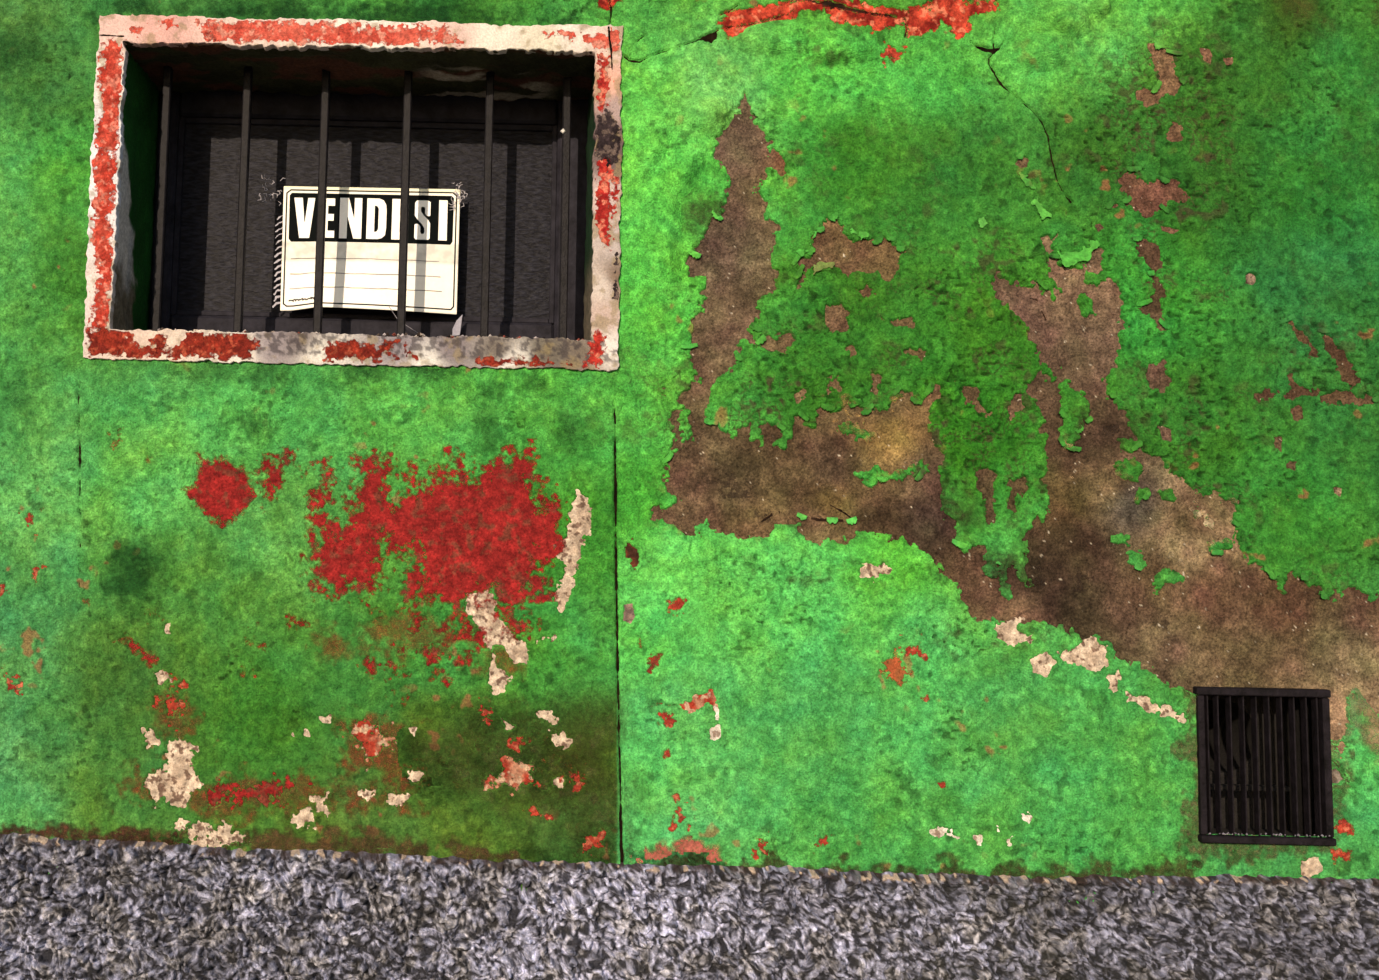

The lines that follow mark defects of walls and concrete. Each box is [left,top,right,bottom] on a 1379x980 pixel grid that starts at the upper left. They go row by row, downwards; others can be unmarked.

crack [608,0,908,70]
peeling [716,0,1000,68]
crack [972,0,1072,203]
peeling [1136,41,1187,108]
peeling [543,0,621,300]
peeling [85,17,464,364]
peeling [475,329,607,369]
peeling [650,93,1379,783]
peeling [181,439,592,796]
peeling [357,770,424,807]
peeling [529,806,553,820]
peeling [582,830,606,856]